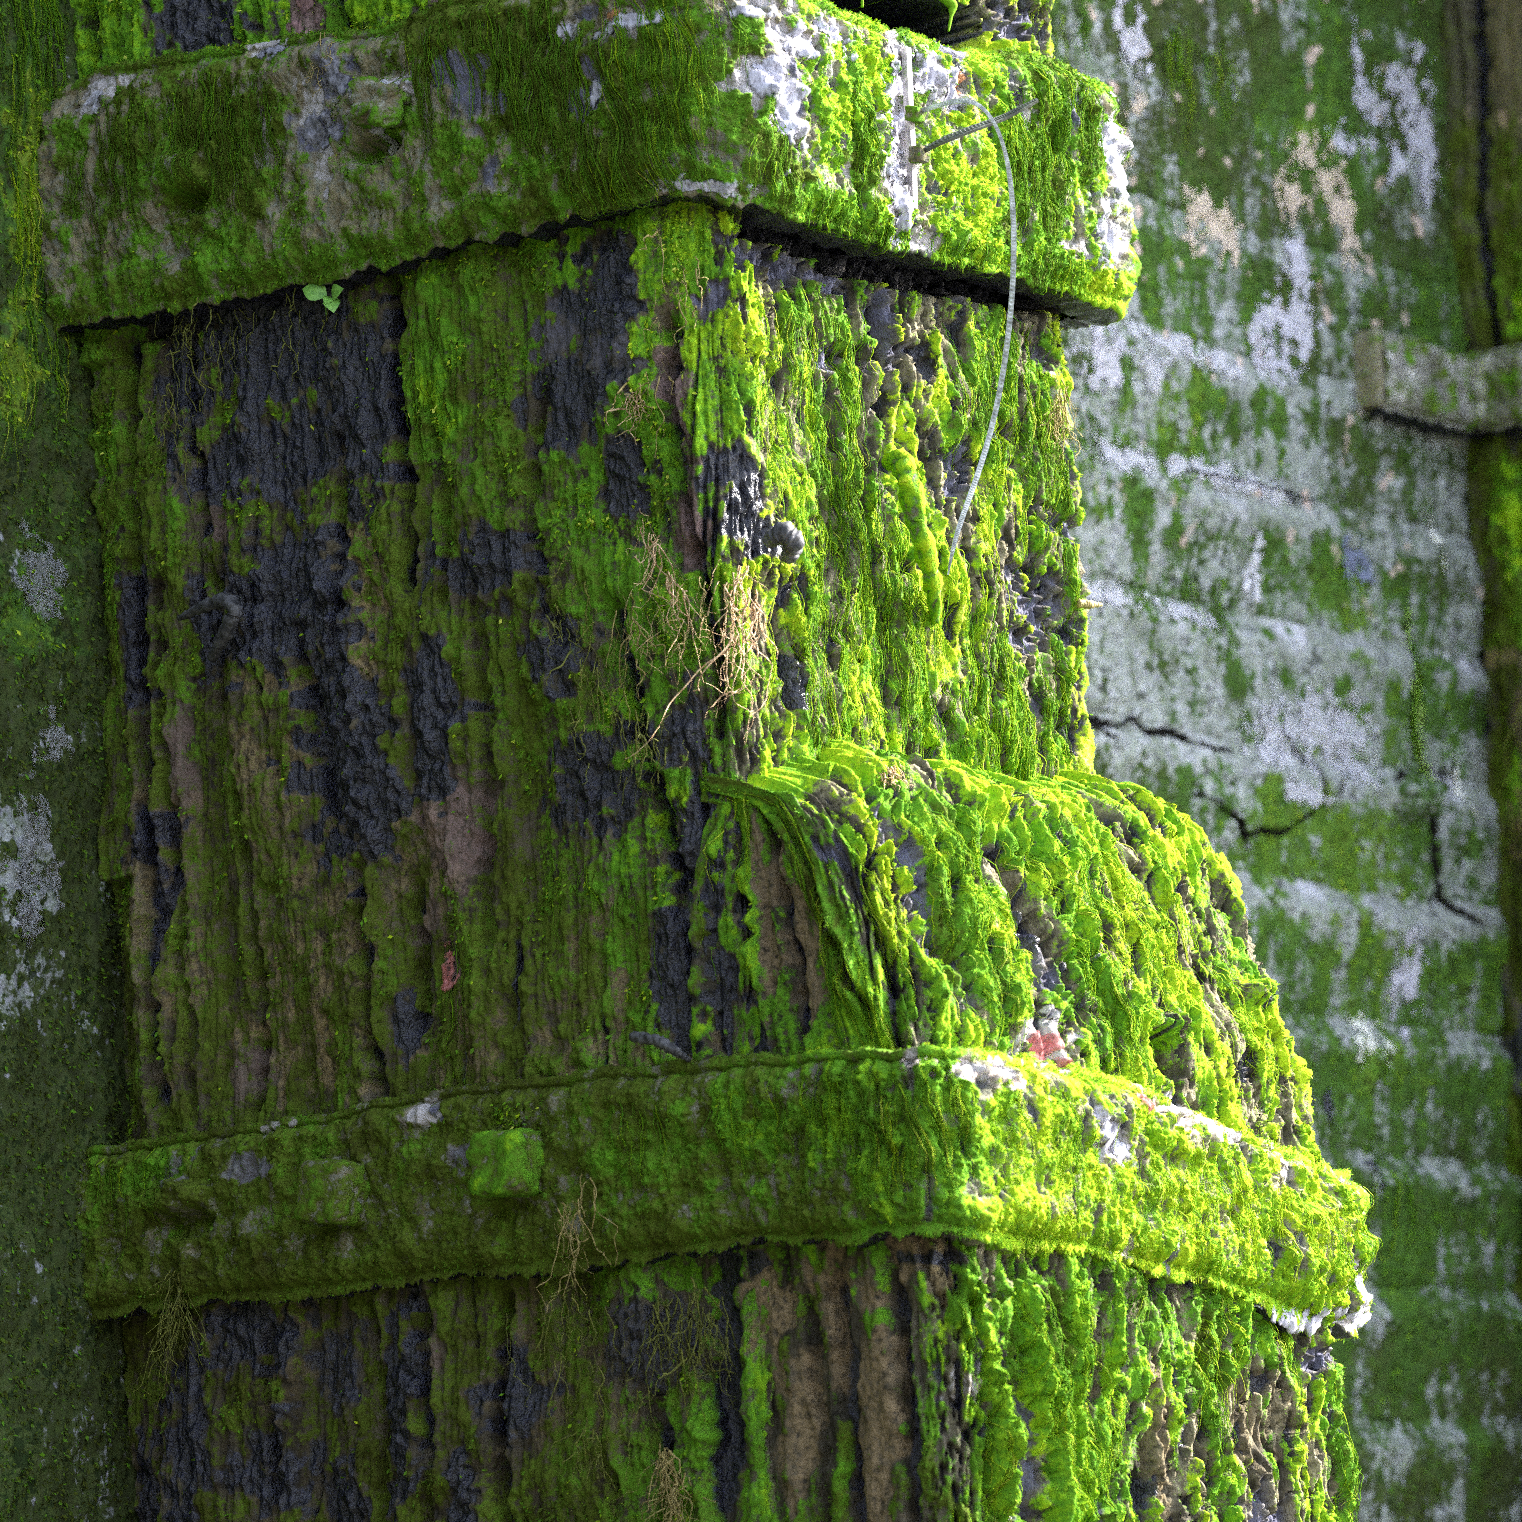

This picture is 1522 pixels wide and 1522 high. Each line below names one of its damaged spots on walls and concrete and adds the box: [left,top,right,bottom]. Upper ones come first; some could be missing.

damp [1427,501,1446,572]
crack [1088,712,1232,752]
crack [1190,729,1328,853]
crack [1394,758,1484,925]
damp [1406,609,1476,818]
damp [1348,924,1431,1069]
damp [1311,1086,1334,1125]